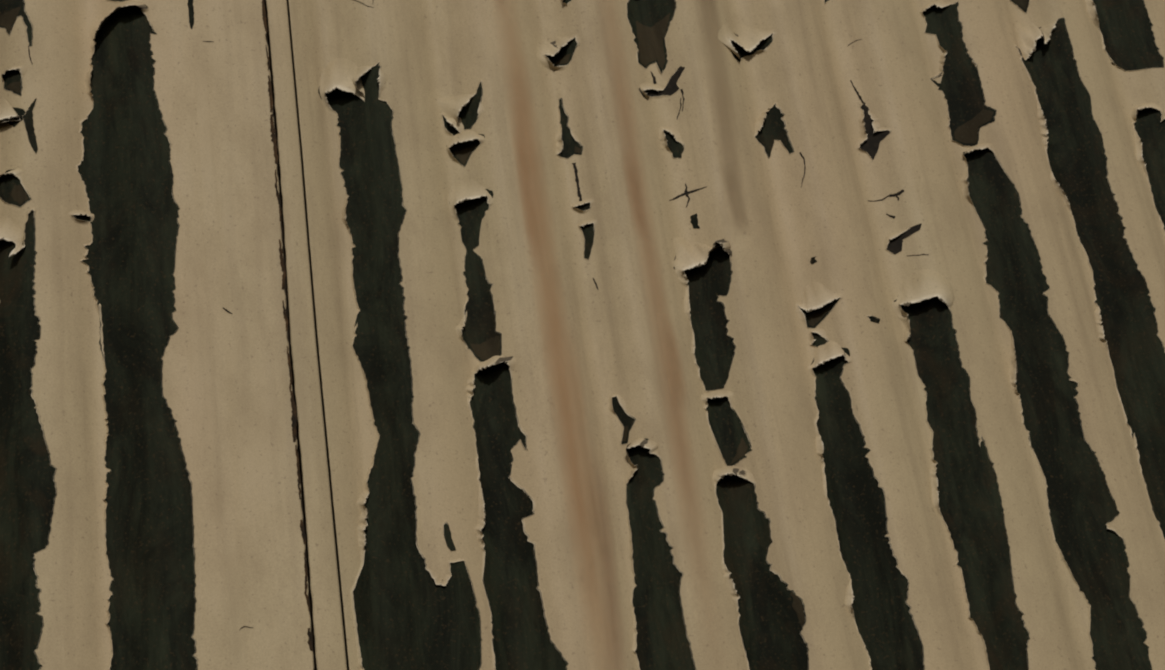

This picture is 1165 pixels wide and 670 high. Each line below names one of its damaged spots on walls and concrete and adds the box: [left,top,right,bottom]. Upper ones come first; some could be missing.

peeling [0,0,34,47]
peeling [0,65,39,154]
peeling [626,0,677,75]
peeling [0,168,58,670]
peeling [68,0,199,670]
peeling [318,58,569,670]
peeling [609,394,697,670]
peeling [671,213,810,670]
peeling [795,282,926,670]
peeling [892,269,1031,670]
peeling [919,0,1165,670]